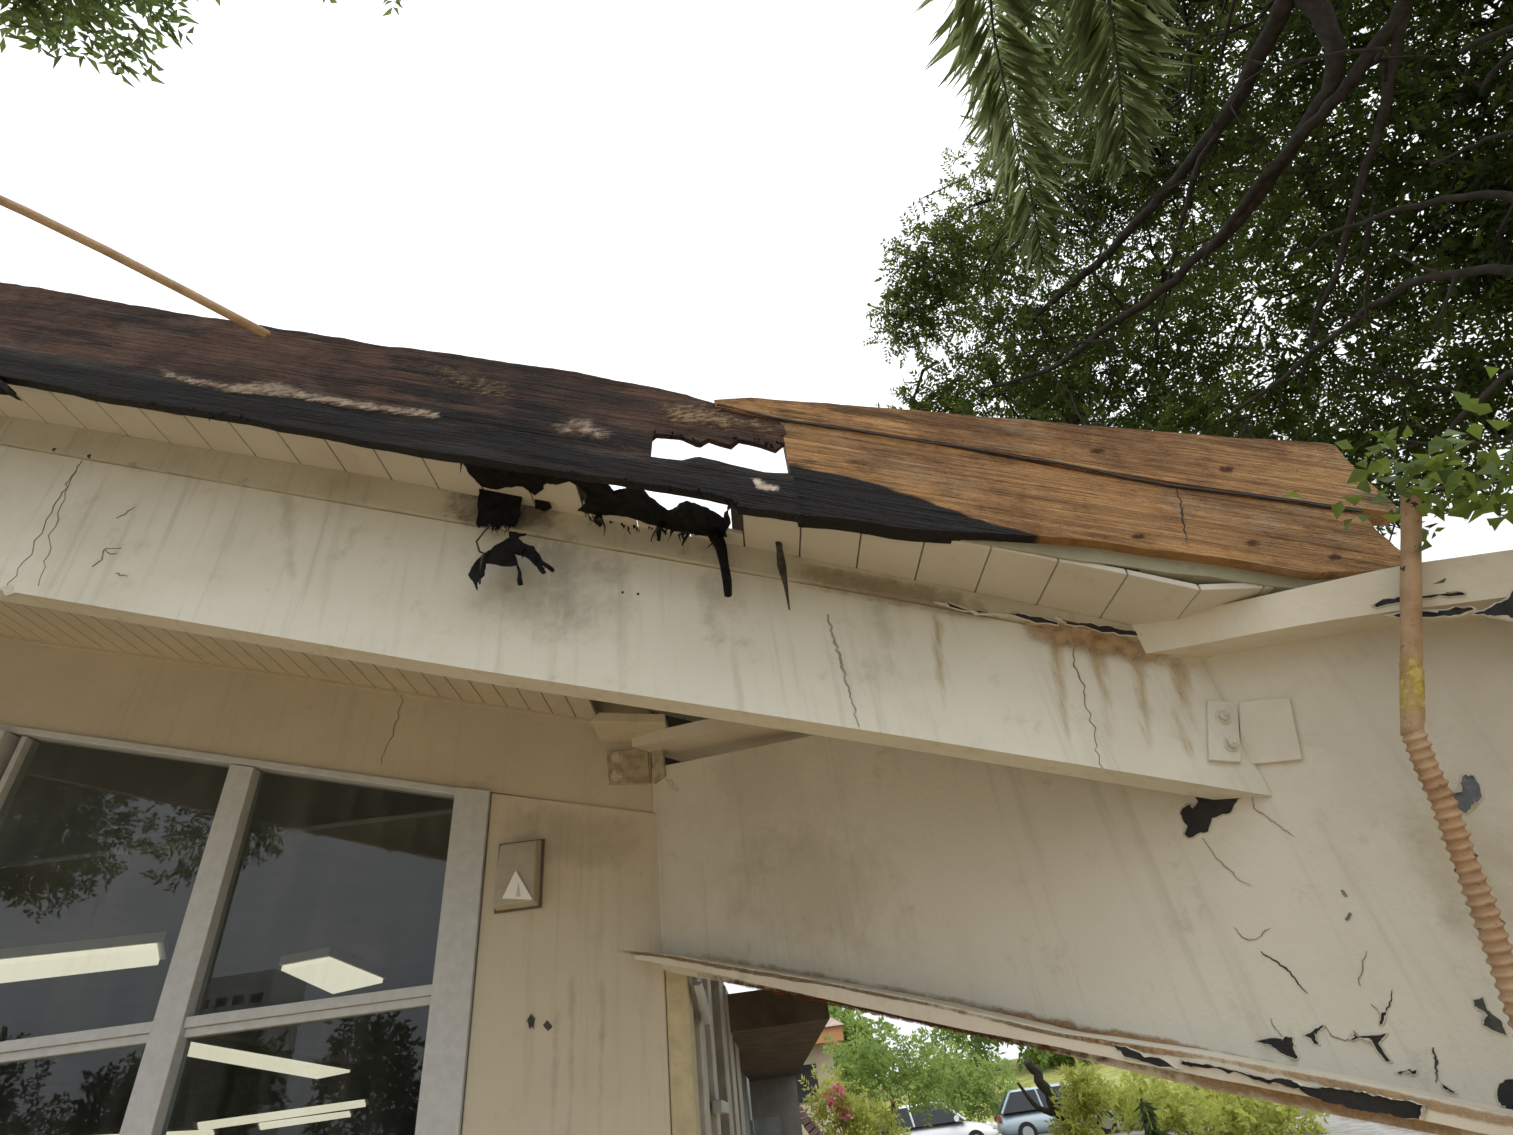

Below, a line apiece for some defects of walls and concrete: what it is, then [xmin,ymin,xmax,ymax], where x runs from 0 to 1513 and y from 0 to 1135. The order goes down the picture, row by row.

crack [7,460,82,586]
peeling [1422,590,1513,622]
crack [827,614,859,726]
corrosion [1026,621,1167,682]
crack [1073,647,1103,768]
peeling [1178,796,1242,839]
peeling [1453,773,1485,816]
crack [1234,927,1308,993]
peeling [1112,1043,1427,1120]
peeling [1255,991,1419,1077]
crack [1431,1047,1439,1083]
peeling [1494,1075,1513,1110]